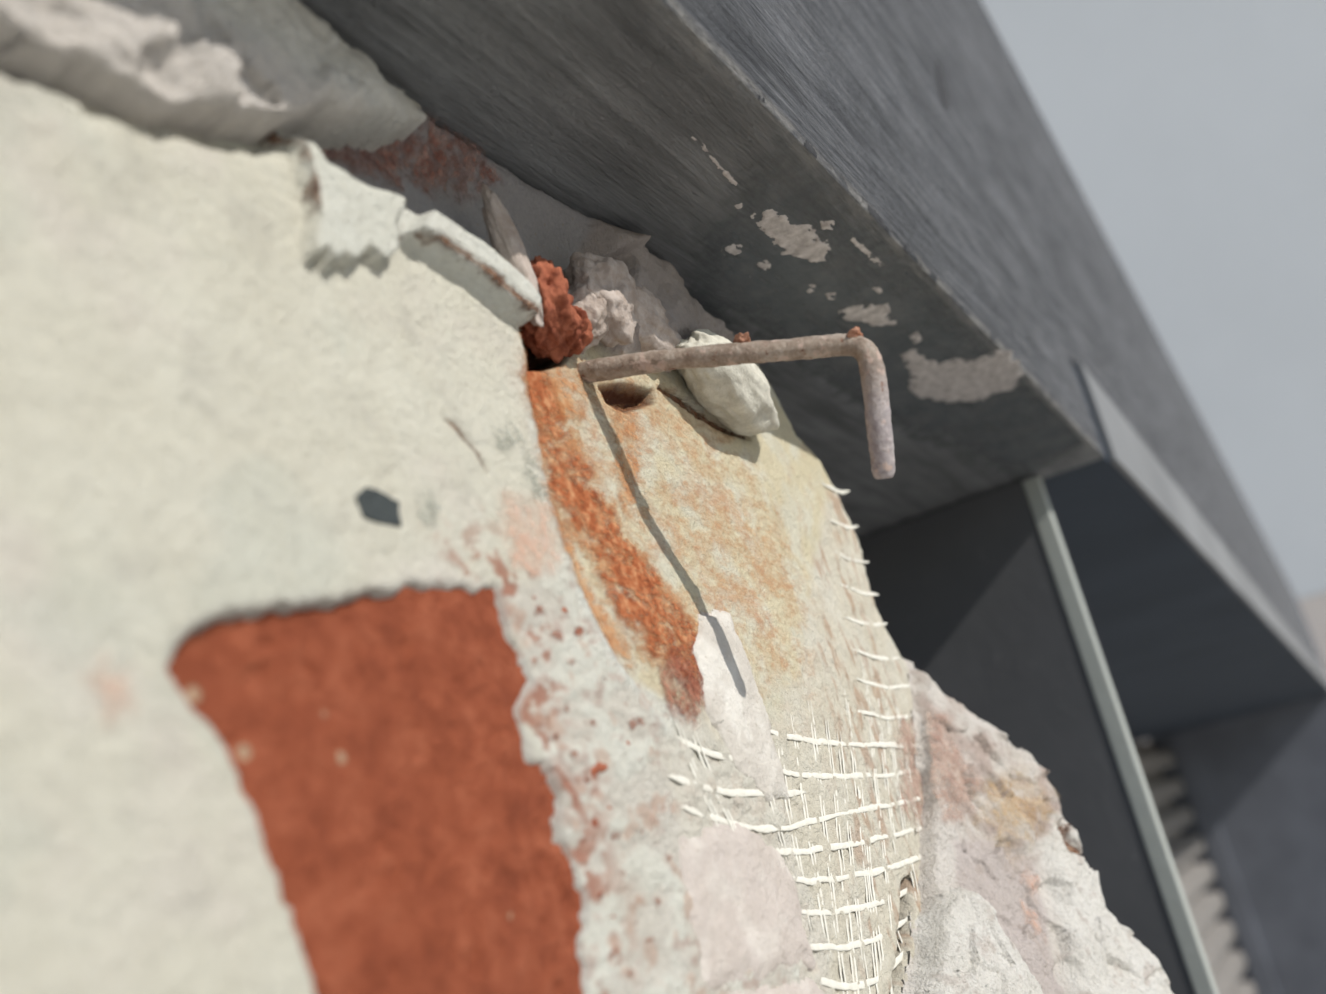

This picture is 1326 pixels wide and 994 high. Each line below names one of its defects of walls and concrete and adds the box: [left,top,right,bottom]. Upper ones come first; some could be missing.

peeling [721,244,743,255]
peeling [735,203,837,270]
corrosion [733,332,751,343]
peeling [807,284,896,326]
corrosion [847,326,863,338]
peeling [900,331,1025,403]
corrosion [523,366,704,721]
flaking render [691,608,789,802]
flaking render [167,587,583,994]
flaking render [584,761,608,782]
flaking render [901,658,1174,994]